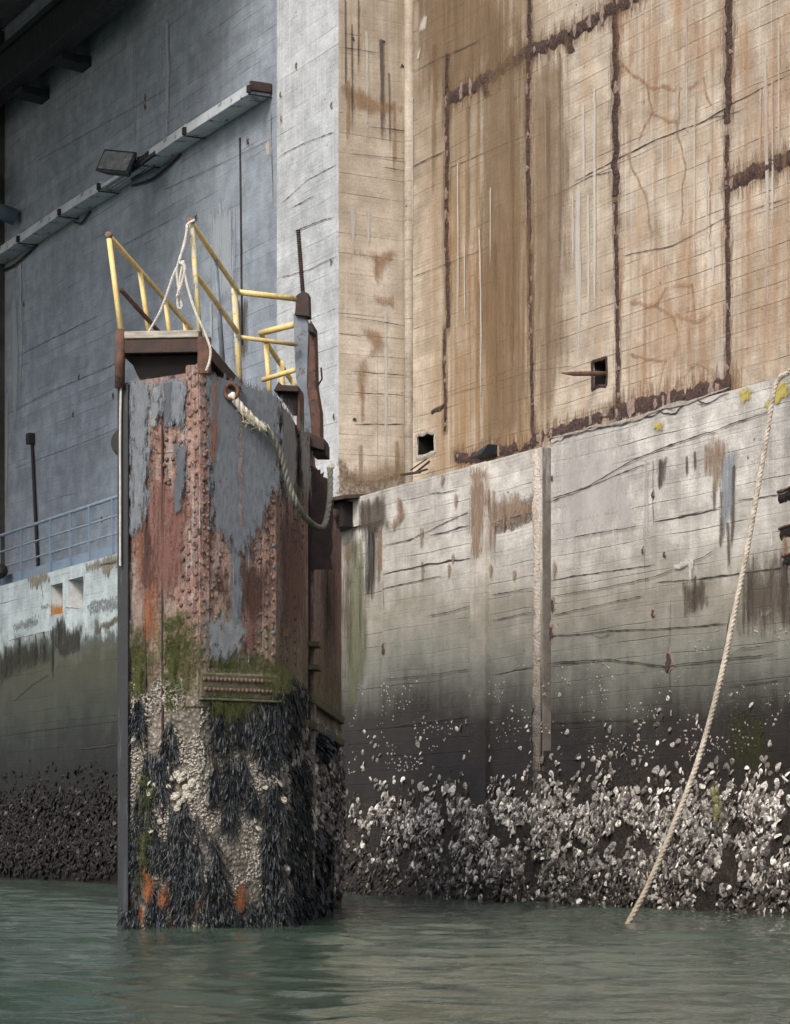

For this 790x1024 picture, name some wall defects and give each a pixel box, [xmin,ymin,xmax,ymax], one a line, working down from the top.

rust [345,82,396,163]
crack [530,76,786,205]
rust [360,252,392,277]
rust [359,330,382,417]
peeling [129,376,187,535]
peeling [203,372,312,664]
rust [129,479,192,654]
leakage [346,497,388,657]
leakage [674,559,708,611]
leakage [0,630,53,681]
rust [142,867,168,906]